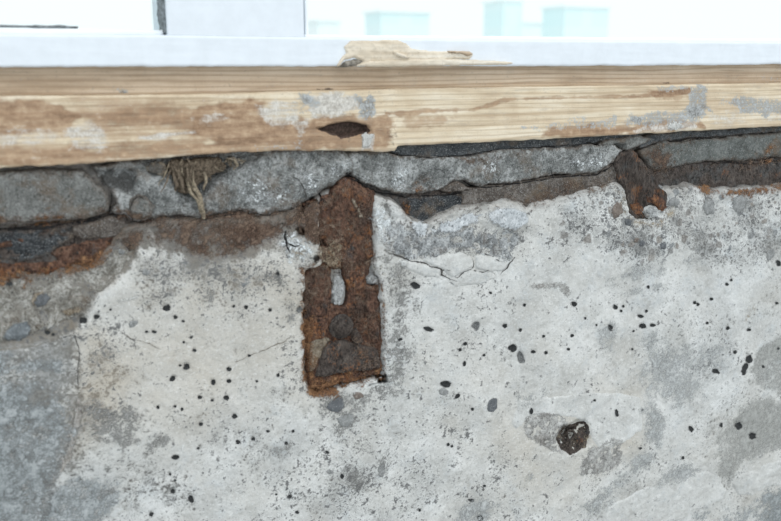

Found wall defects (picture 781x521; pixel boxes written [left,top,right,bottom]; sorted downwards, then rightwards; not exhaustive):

rust [0,188,387,399]
crack [388,252,515,281]